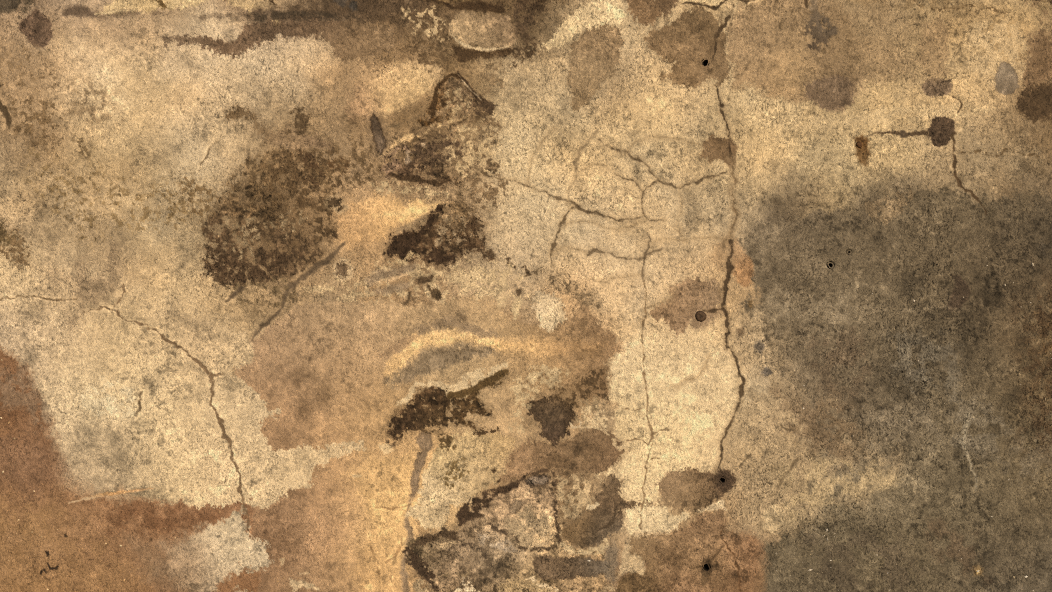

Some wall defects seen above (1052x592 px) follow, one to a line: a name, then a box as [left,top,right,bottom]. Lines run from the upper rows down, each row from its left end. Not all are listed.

leakage [725,0,1052,167]
leakage [0,0,475,339]
crack [249,238,348,346]
crack [471,0,763,532]
leakage [734,300,781,381]
leakage [859,184,920,230]
leakage [945,272,972,313]
crack [943,91,1052,219]
crack [0,282,256,536]
leakage [377,357,620,456]
spalling [396,275,773,592]
crack [766,420,800,501]